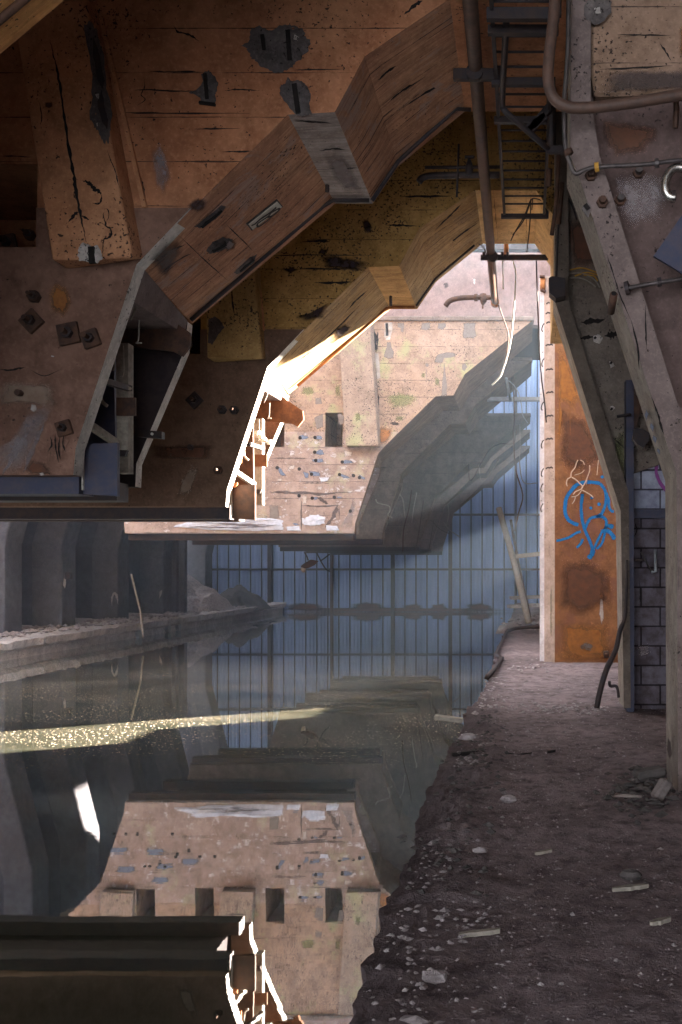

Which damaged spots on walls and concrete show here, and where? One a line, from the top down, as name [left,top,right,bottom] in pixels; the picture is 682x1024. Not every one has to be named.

spalling [84,21,113,144]
spalling [189,70,218,107]
spalling [242,24,312,117]
crack [39,43,145,256]
rust [558,356,598,467]
rust [561,564,609,611]